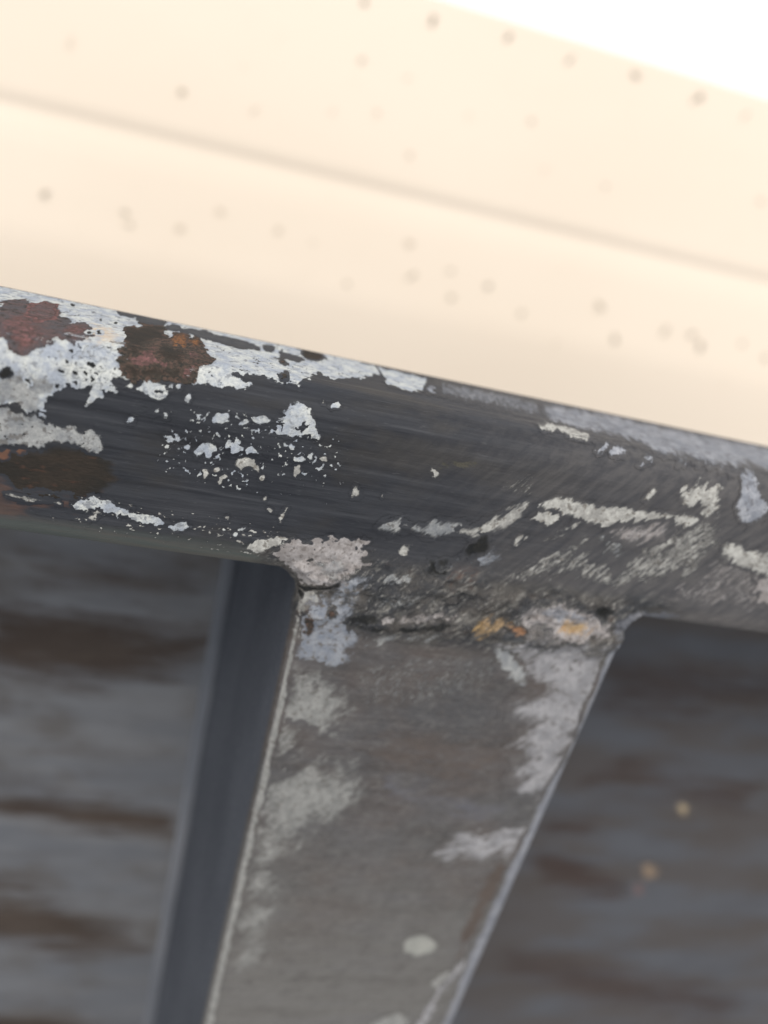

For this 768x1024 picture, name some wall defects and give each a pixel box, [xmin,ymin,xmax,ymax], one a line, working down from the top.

corrosion [0,298,218,385]
corrosion [0,444,222,714]
peeling [0,286,768,1024]
corrosion [465,609,529,643]